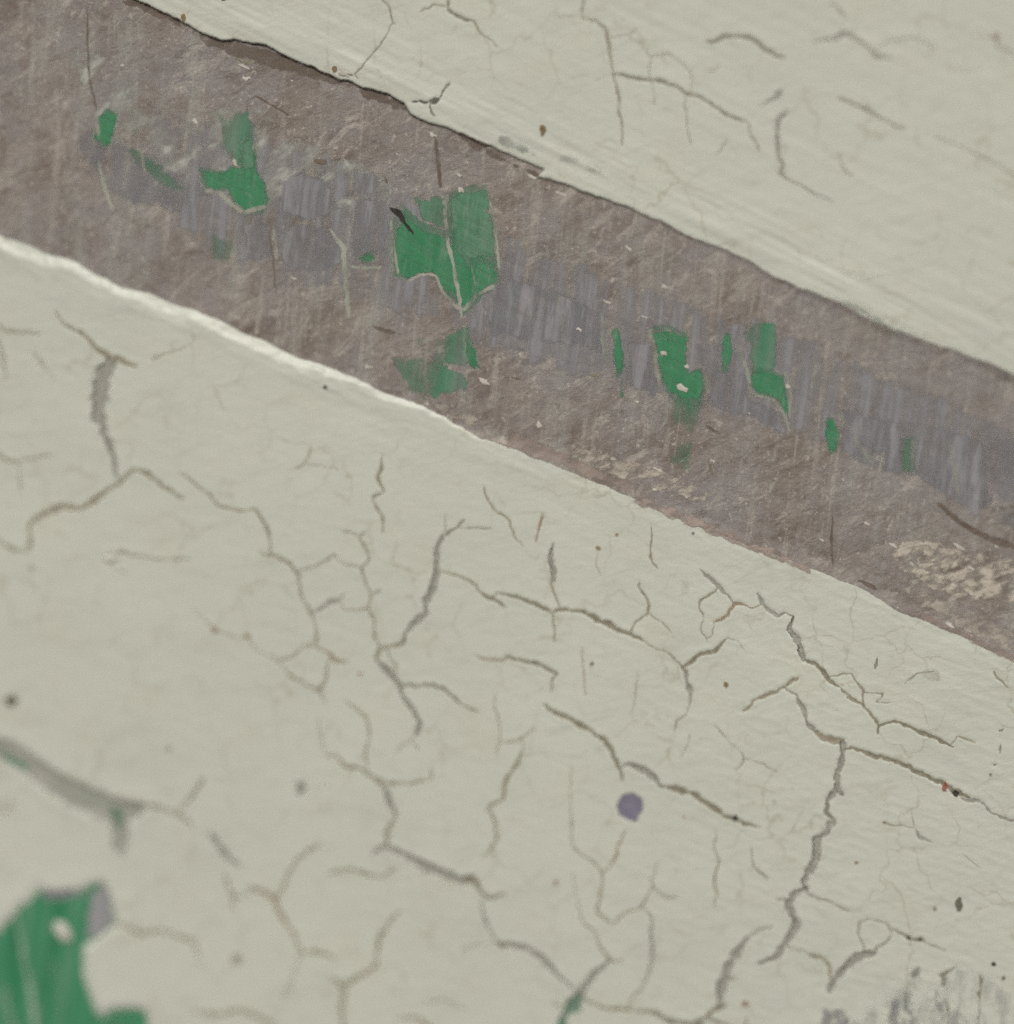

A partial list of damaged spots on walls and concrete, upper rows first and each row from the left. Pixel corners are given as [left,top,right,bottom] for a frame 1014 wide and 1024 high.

crack [413,83,450,116]
crack [421,0,498,47]
crack [581,0,833,202]
crack [813,32,892,60]
crack [837,98,903,130]
crack [0,310,1014,1024]
peeling [0,739,146,857]
peeling [0,883,147,1024]